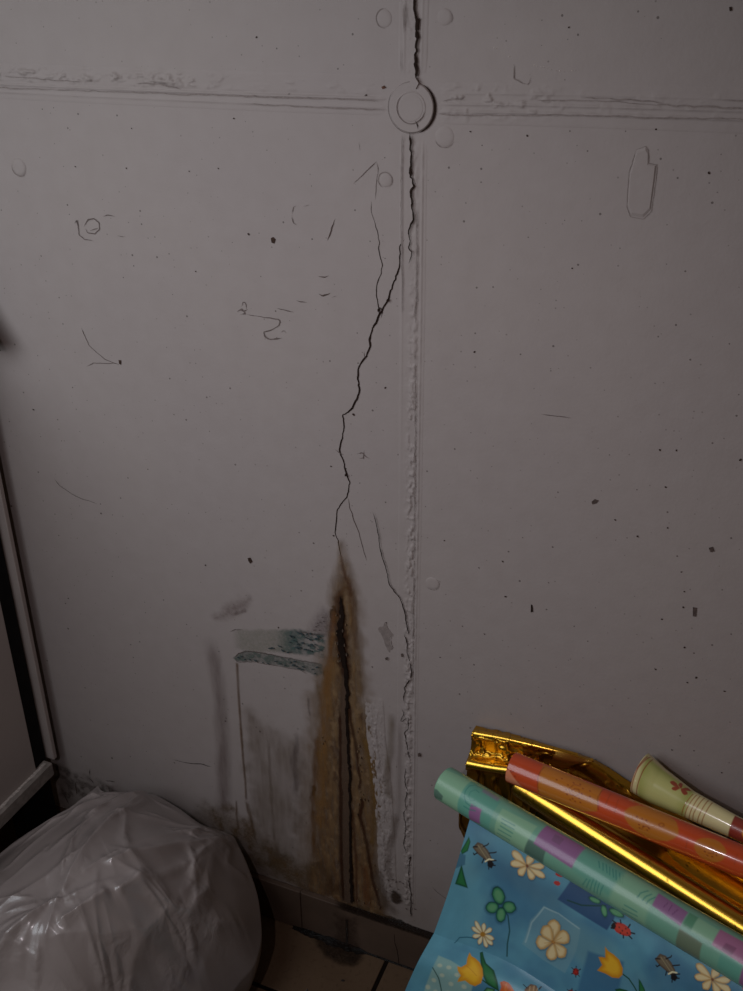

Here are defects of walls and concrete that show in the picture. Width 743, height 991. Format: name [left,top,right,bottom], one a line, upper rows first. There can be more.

crack [412,0,420,77]
crack [335,123,445,914]
rust [308,561,384,915]